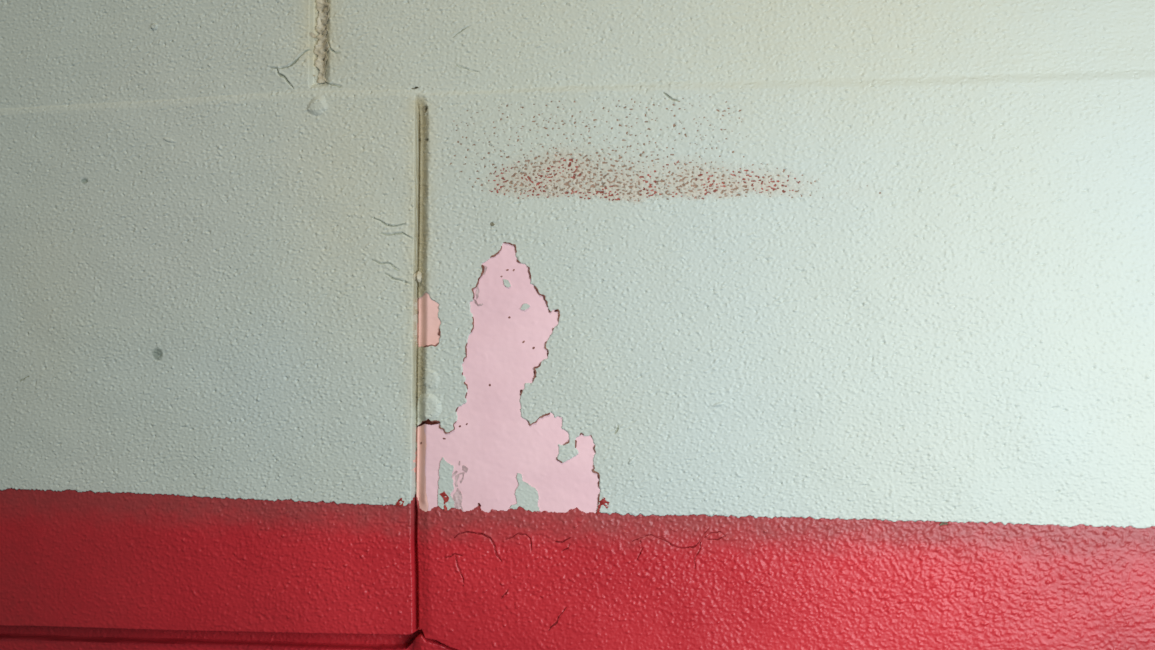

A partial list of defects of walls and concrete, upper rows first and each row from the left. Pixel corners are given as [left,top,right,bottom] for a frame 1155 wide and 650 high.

peeling [413,242,600,513]